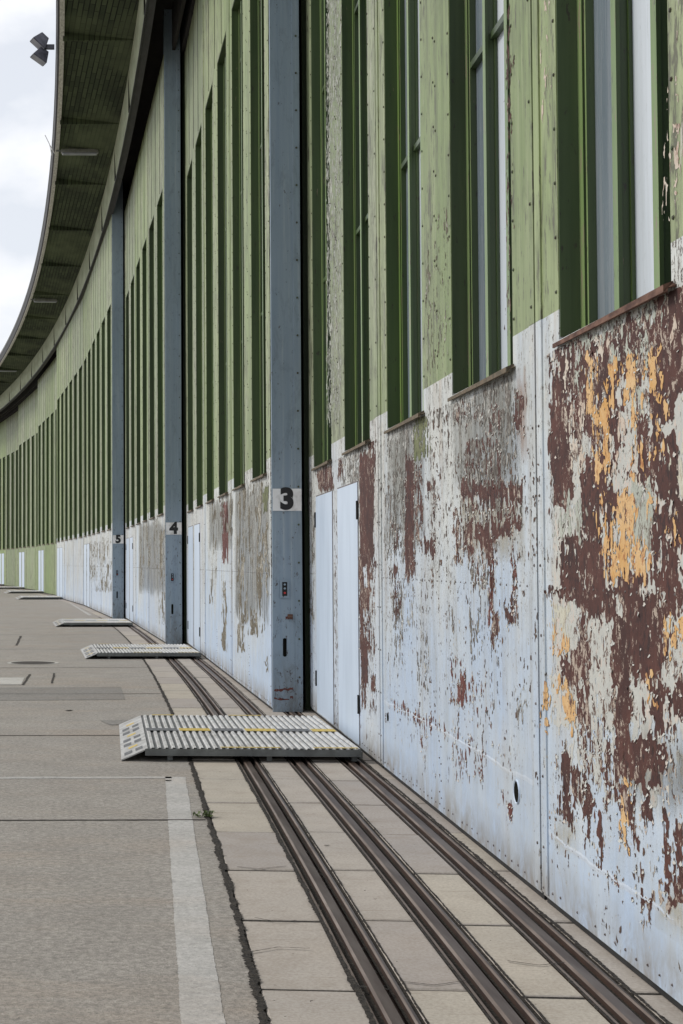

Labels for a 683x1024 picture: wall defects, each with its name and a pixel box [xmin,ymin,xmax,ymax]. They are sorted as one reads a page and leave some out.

peeling [315,458,343,494]
peeling [358,285,683,945]